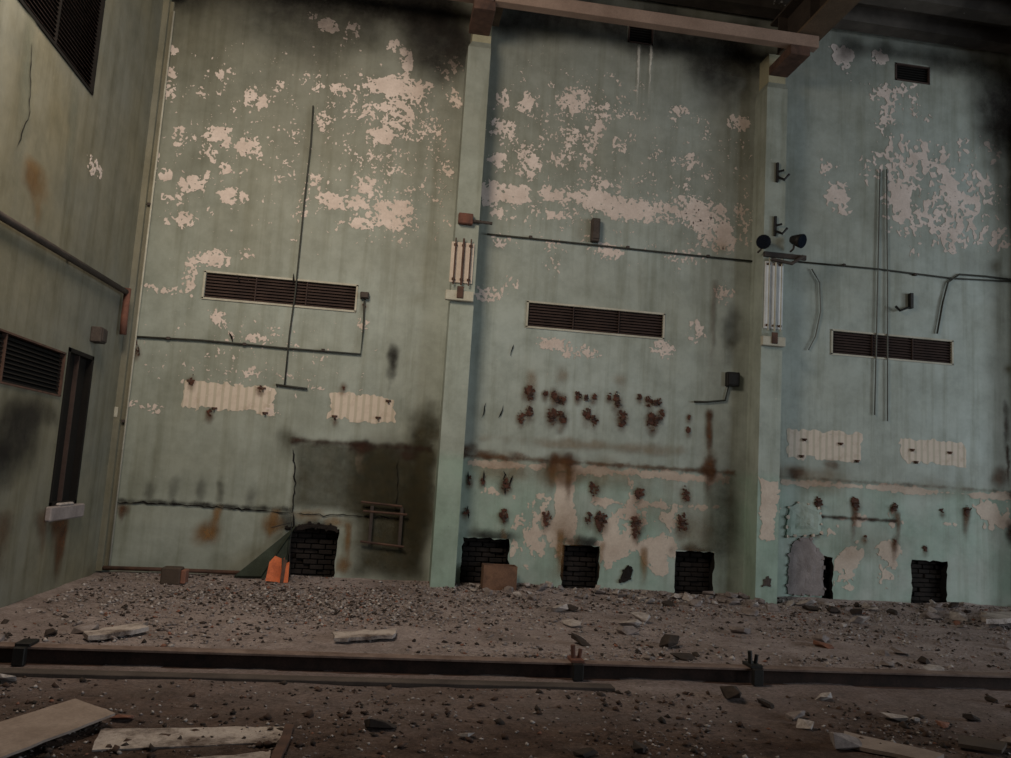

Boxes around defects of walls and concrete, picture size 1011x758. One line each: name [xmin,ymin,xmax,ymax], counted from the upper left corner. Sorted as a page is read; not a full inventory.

peeling [156,39,464,248]
peeling [481,65,753,274]
peeling [859,83,1011,257]
peeling [144,248,255,298]
rust [463,446,518,460]
rust [517,385,627,427]
rust [530,454,625,486]
rust [637,394,665,432]
rust [638,411,734,480]
rust [585,511,608,532]
peeling [758,477,950,542]
spalling [785,512,904,597]